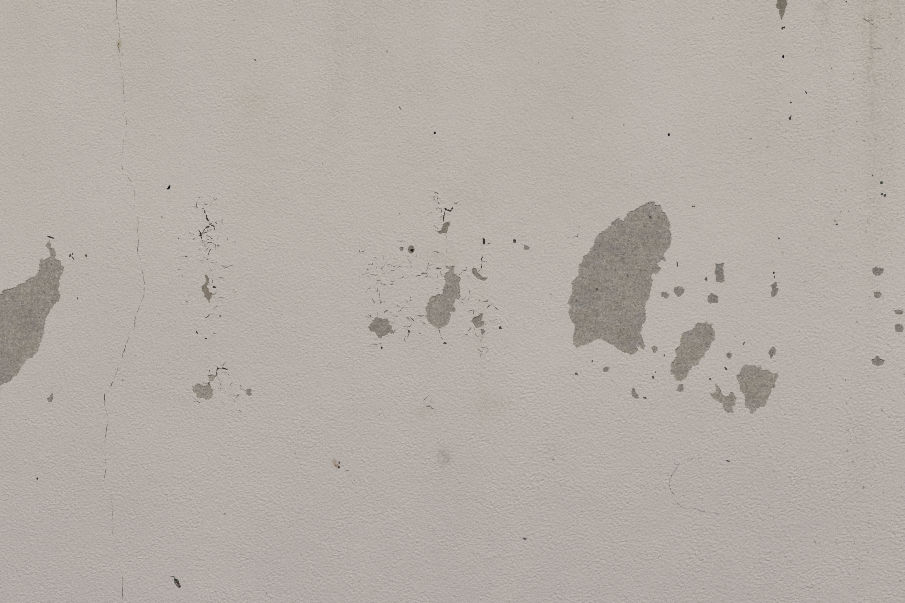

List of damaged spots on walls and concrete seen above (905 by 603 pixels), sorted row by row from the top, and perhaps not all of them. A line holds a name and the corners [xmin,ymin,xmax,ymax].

peeling [776,0,787,20]
peeling [0,241,64,386]
peeling [202,275,212,303]
peeling [368,317,396,339]
peeling [425,266,460,329]
peeling [568,202,672,356]
peeling [661,287,684,299]
peeling [671,322,715,392]
peeling [193,375,215,400]
peeling [710,365,778,414]